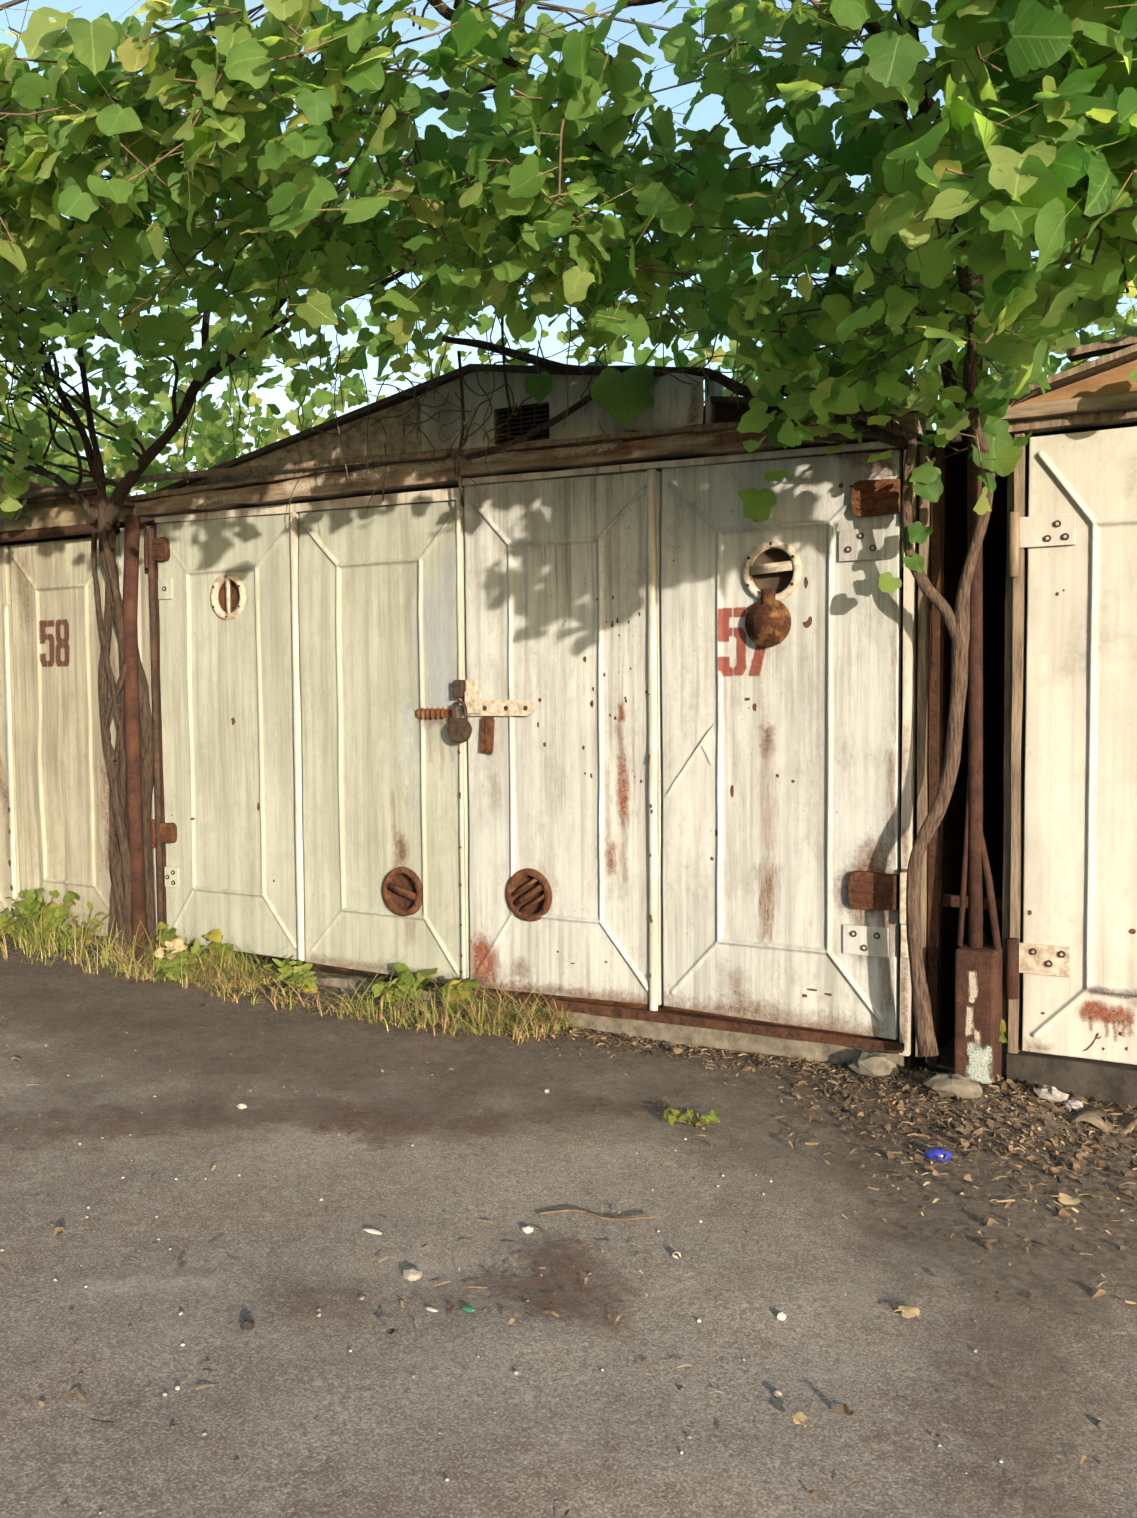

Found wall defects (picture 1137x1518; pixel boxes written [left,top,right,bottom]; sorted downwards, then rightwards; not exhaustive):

corrosion [618,706,628,823]
corrosion [763,873,773,936]
corrosion [470,938,649,1008]
peeling [966,971,994,1085]
corrosion [1080,1002,1133,1038]